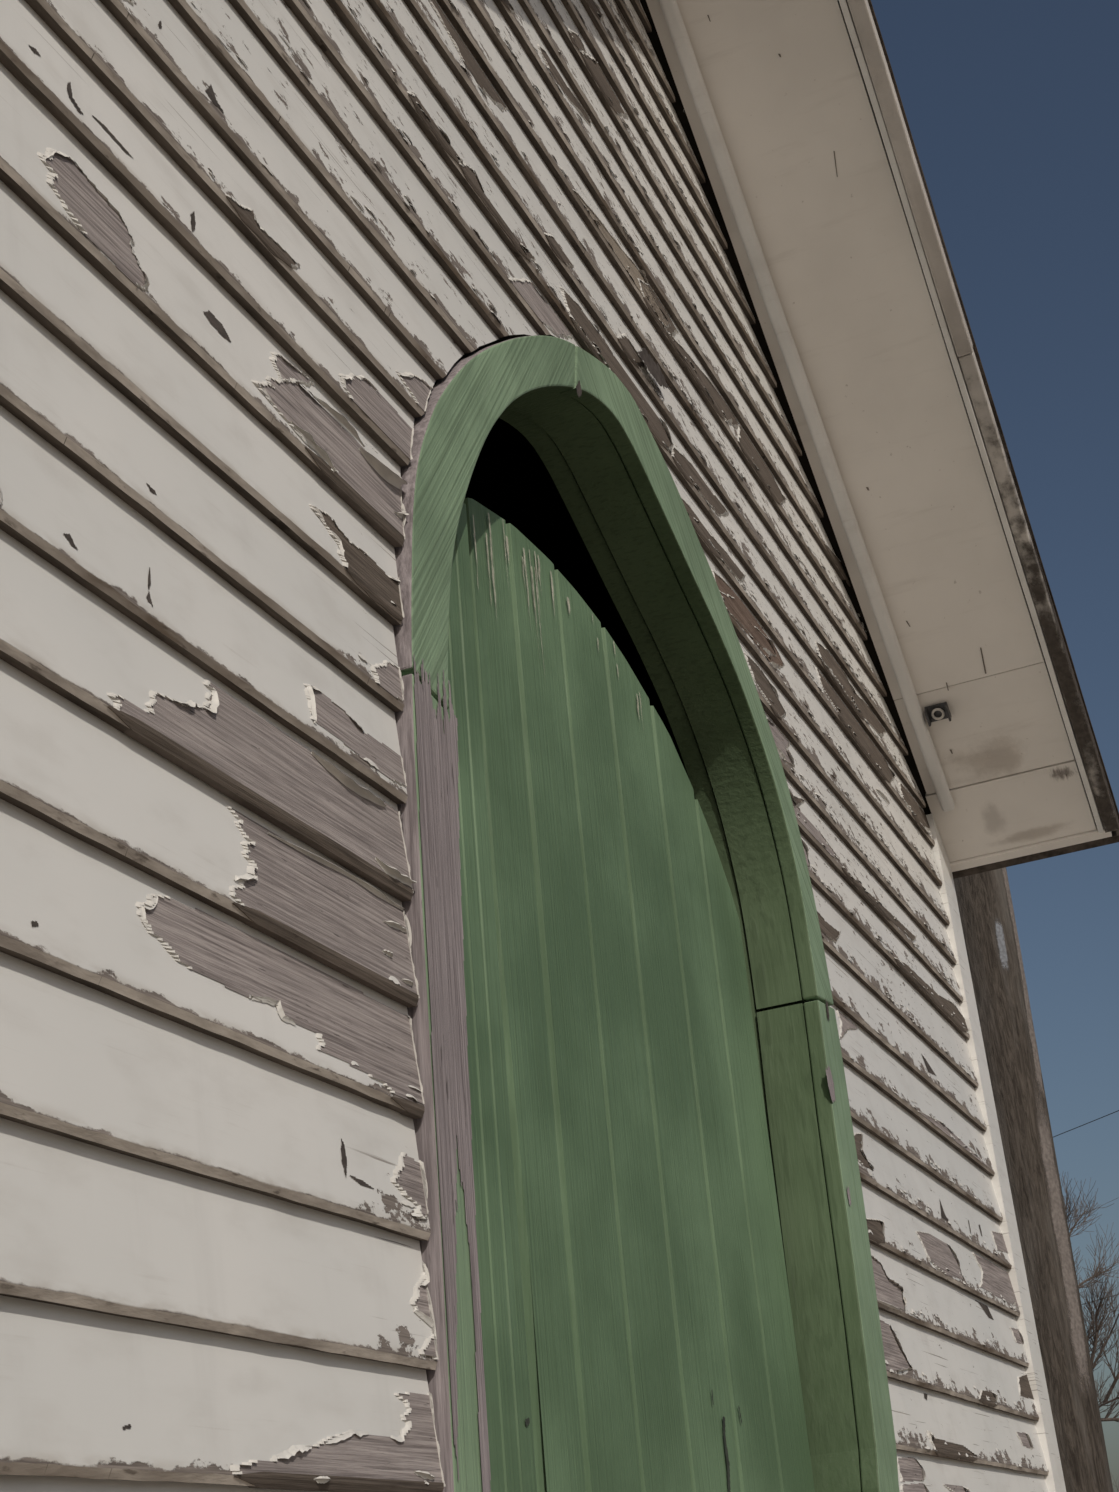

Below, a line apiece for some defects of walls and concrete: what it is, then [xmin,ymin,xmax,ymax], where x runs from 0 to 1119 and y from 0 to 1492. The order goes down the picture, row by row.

peeling [37,147,150,293]
peeling [251,351,414,548]
peeling [395,370,433,411]
peeling [308,503,404,621]
peeling [407,0,969,1033]
peeling [106,654,491,1492]
peeling [826,1065,836,1102]
peeling [854,1133,874,1176]
peeling [825,998,905,1055]
peeling [885,1084,991,1169]
peeling [866,1218,1034,1410]
peeling [996,1431,1034,1467]